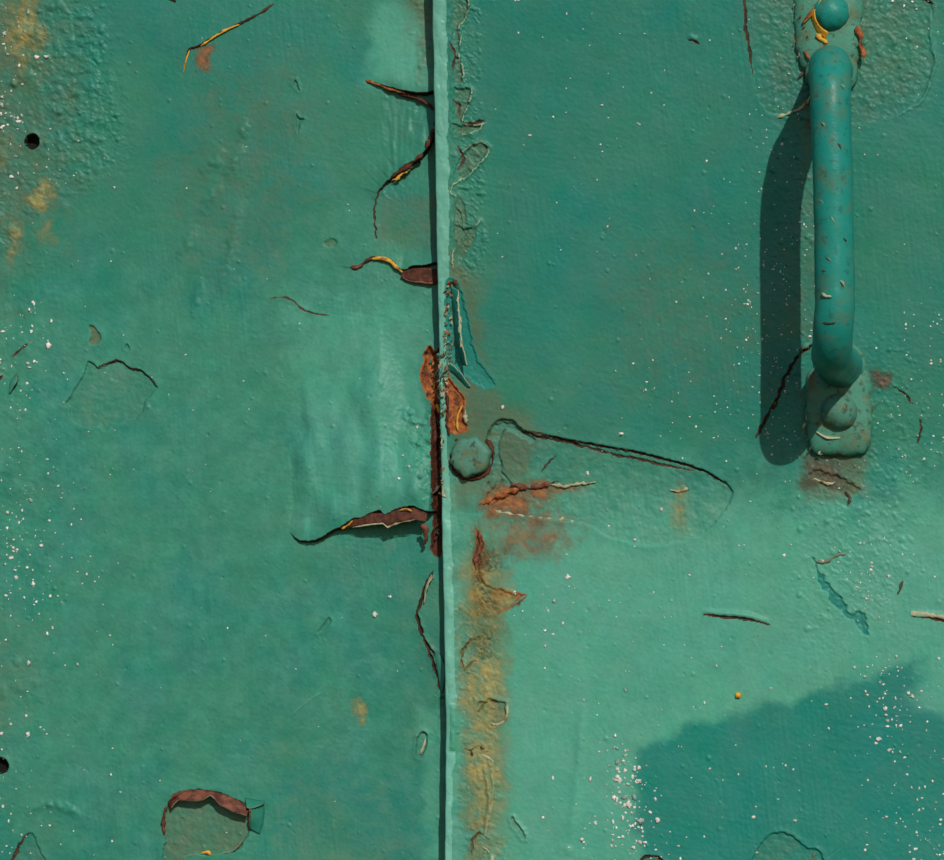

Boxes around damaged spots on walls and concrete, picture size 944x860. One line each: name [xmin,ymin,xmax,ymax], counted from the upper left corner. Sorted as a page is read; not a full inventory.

corrosion [197,46,212,69]
peeling [157,0,274,72]
peeling [742,0,829,126]
peeling [841,0,937,127]
peeling [290,0,497,545]
peeling [64,342,160,433]
crack [755,322,835,439]
peeling [478,417,735,548]
corrosion [463,550,516,826]
peeling [11,831,47,860]
peeling [160,787,265,860]
peeling [750,830,825,860]